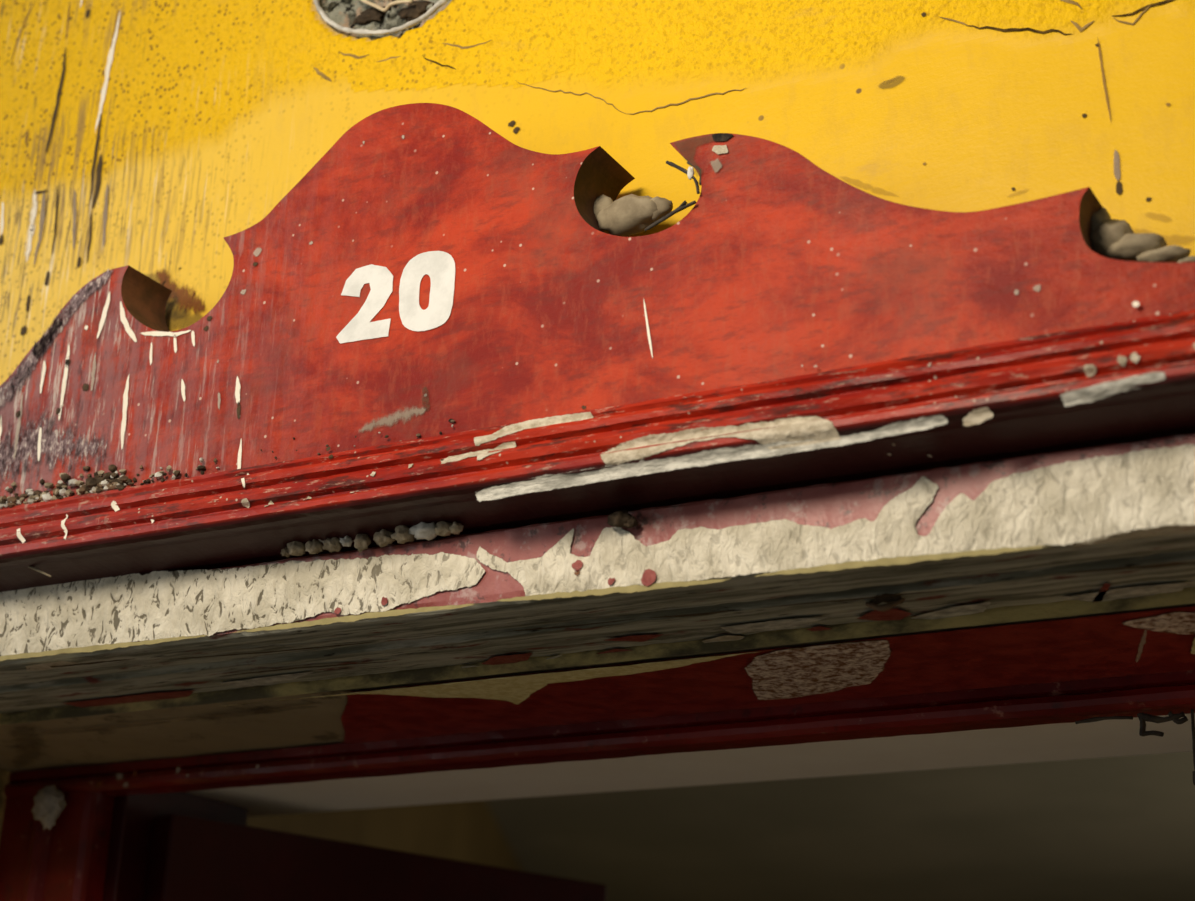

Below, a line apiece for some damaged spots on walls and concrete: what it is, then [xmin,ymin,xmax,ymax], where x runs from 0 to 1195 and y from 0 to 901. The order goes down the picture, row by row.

spalling [313,0,452,40]
crack [940,0,1173,35]
peeling [1060,352,1166,406]
peeling [963,407,993,426]
peeling [475,415,948,502]
peeling [0,444,1195,656]
peeling [225,639,891,706]